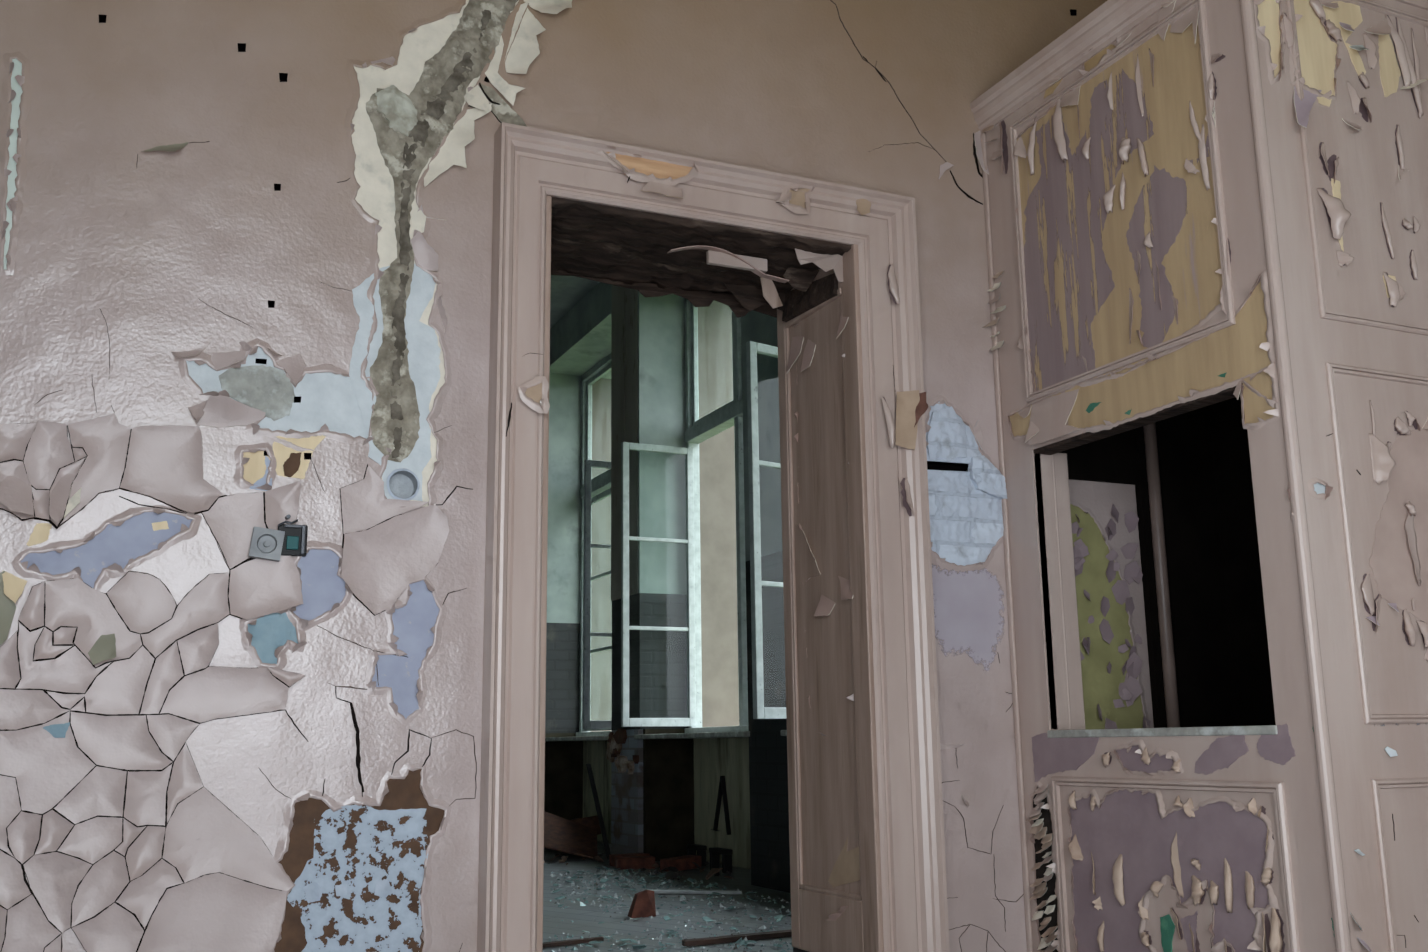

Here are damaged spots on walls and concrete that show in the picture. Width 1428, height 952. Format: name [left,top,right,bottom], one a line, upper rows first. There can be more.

peeling [598,147,700,198]
crack [830,0,983,205]
peeling [973,0,1281,446]
peeling [1317,142,1354,267]
peeling [1253,0,1428,130]
peeling [1380,202,1420,308]
peeling [1395,124,1409,180]
peeling [0,0,572,952]
peeling [881,367,1008,572]
peeling [1357,400,1428,661]
peeling [606,728,639,774]
peeling [1025,499,1296,952]